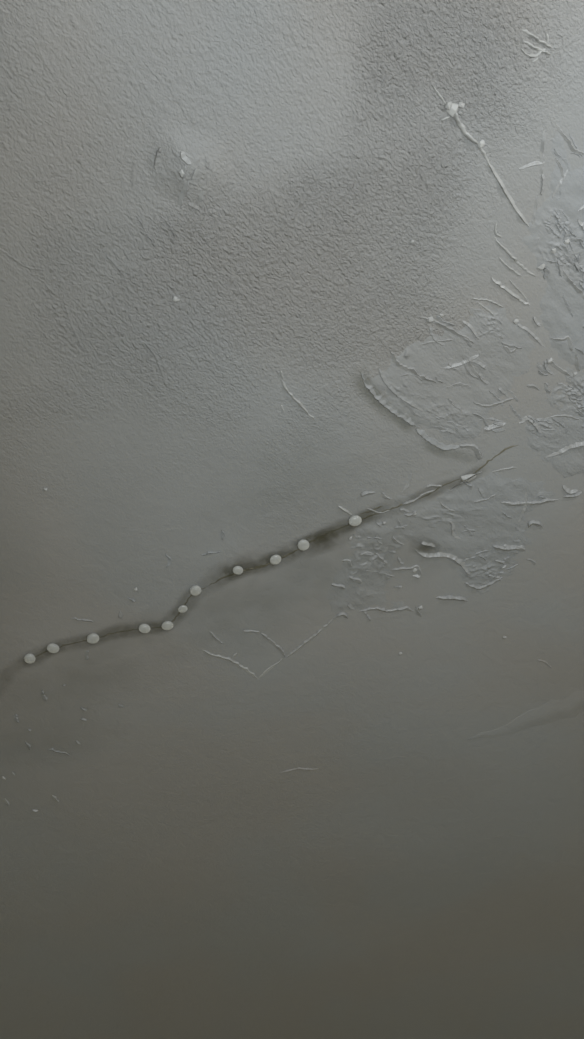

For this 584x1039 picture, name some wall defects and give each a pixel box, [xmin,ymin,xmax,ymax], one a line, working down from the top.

crack [35,445,518,657]
peeling [202,466,578,679]